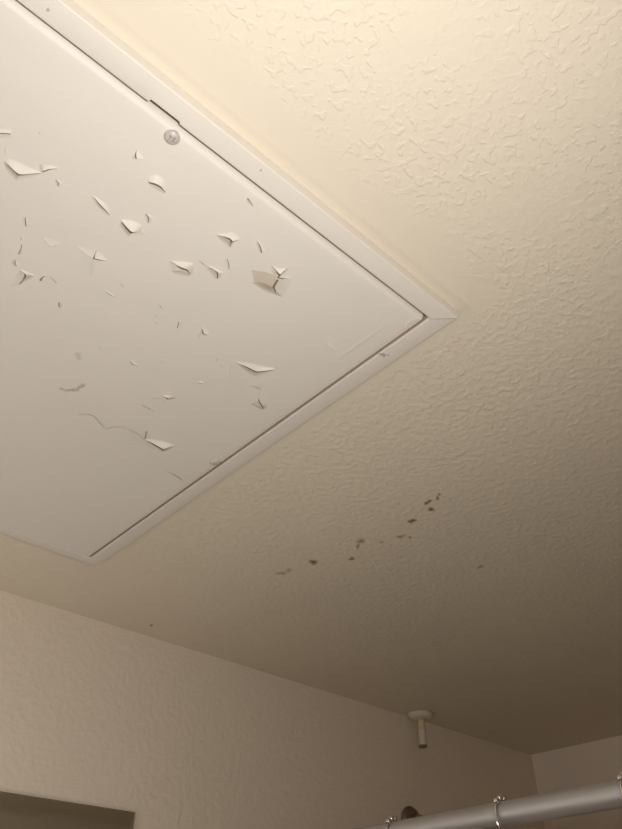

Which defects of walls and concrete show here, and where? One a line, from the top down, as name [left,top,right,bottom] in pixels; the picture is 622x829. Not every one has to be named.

peeling [3,159,62,187]
peeling [147,174,167,194]
peeling [119,213,153,237]
peeling [216,232,241,247]
peeling [10,236,57,286]
peeling [169,258,231,279]
peeling [251,265,292,297]
peeling [237,361,274,410]
peeling [123,428,177,452]